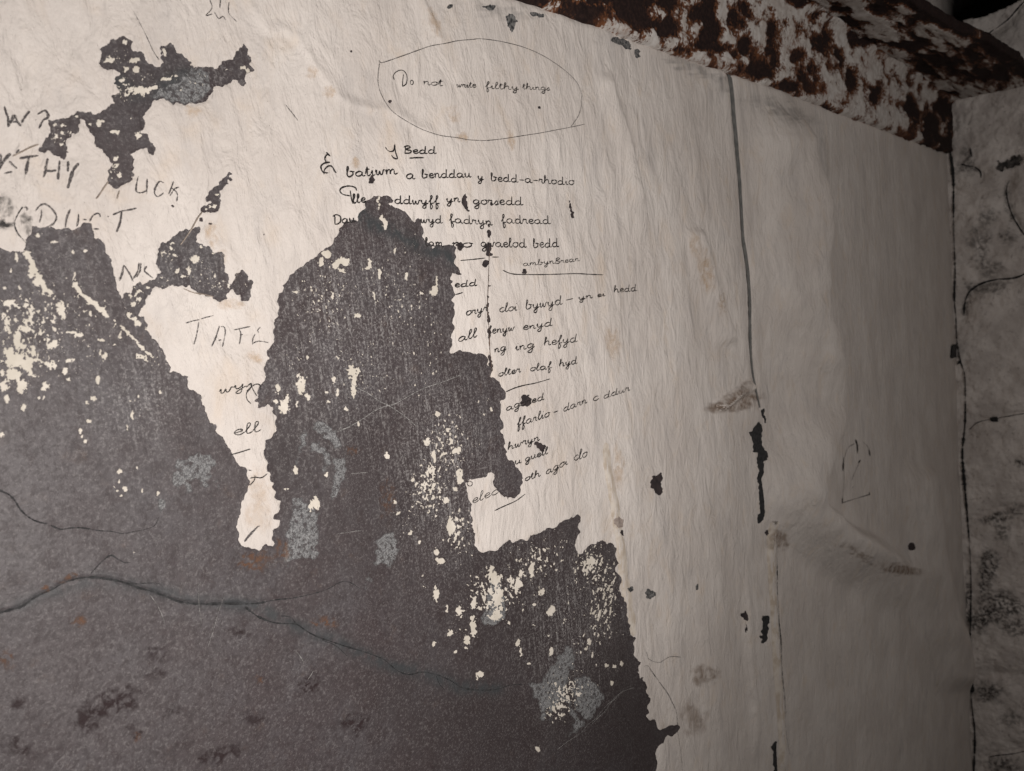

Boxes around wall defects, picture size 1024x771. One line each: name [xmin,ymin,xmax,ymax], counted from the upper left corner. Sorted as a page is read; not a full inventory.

peeling [38,36,254,189]
peeling [0,172,680,771]
crack [0,490,523,691]